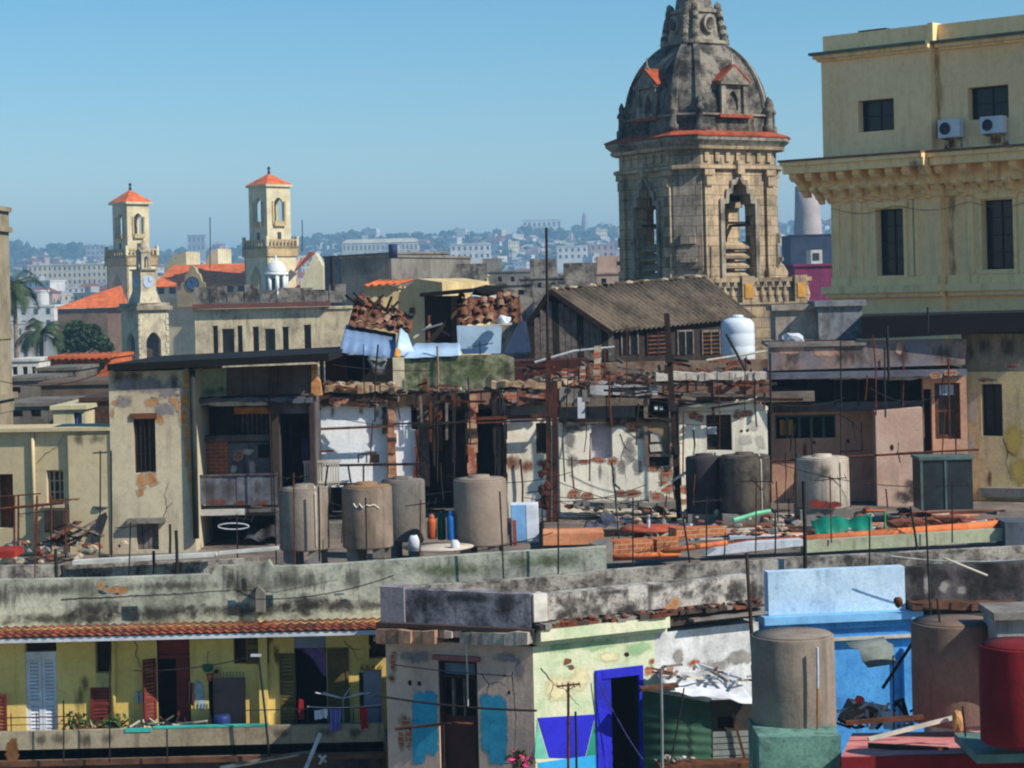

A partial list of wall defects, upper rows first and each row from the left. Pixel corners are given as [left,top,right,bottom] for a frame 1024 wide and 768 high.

flaking render [110,368,192,506]
flaking render [562,422,686,505]
damp [26,574,380,623]
damp [730,581,758,600]
peeling [545,644,589,701]